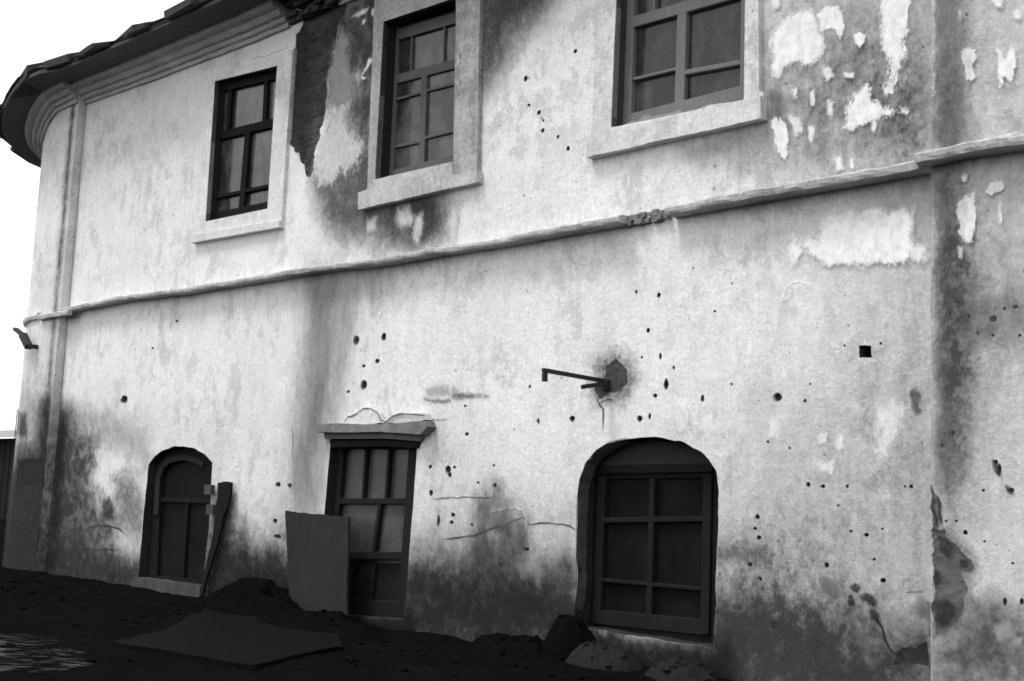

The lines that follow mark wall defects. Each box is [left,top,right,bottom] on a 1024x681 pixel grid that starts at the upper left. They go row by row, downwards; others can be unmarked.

spalling [290,6,365,188]
damp [313,0,458,246]
peeling [768,5,866,79]
peeling [842,0,912,128]
peeling [787,205,938,268]
crack [345,394,486,423]
damp [2,394,142,585]
damp [349,486,574,642]
crack [433,493,492,501]
crack [446,517,576,540]
damp [595,601,1024,681]
spalling [894,520,975,666]